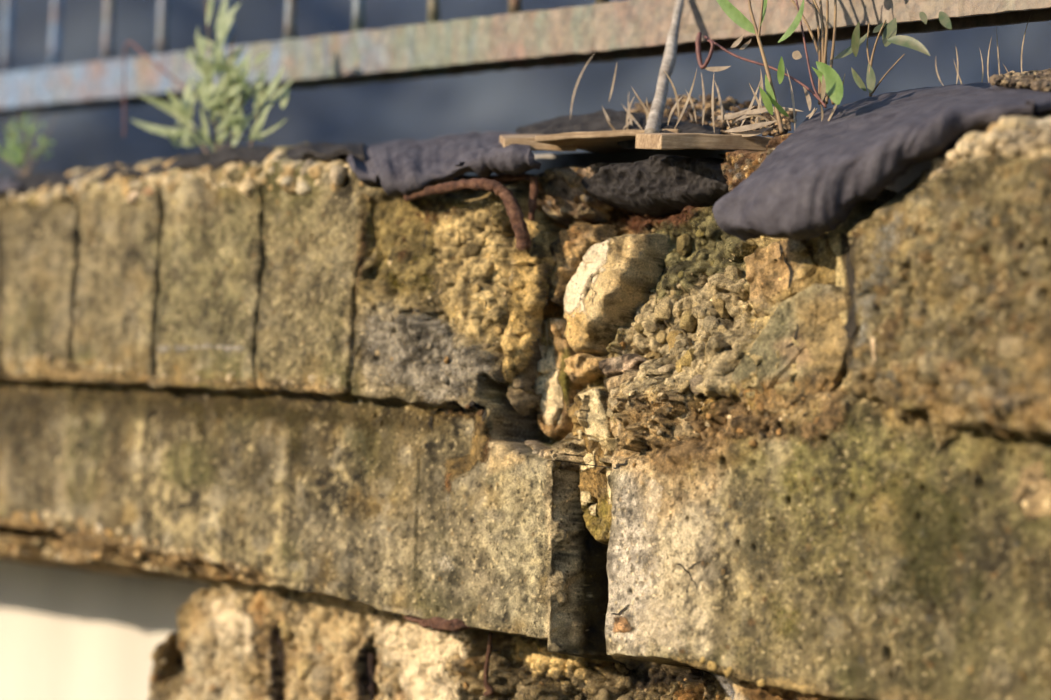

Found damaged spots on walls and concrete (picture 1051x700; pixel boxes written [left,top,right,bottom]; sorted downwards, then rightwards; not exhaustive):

rust [403,173,539,250]
crack [844,246,857,338]
spalling [365,199,516,481]
spalling [619,209,846,474]
crack [549,455,635,469]
crack [0,526,80,538]
spalling [613,616,633,633]
spalling [154,632,184,688]
spalling [485,650,660,700]